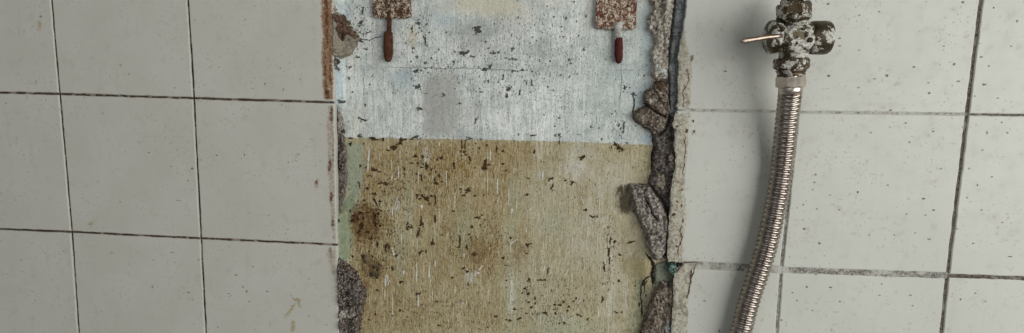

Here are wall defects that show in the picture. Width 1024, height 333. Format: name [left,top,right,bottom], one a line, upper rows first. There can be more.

spalling [405,19,551,98]
leakage [338,144,401,242]
flaking render [333,6,421,333]
spalling [403,137,507,238]
peeling [601,0,697,333]
spalling [487,268,589,328]